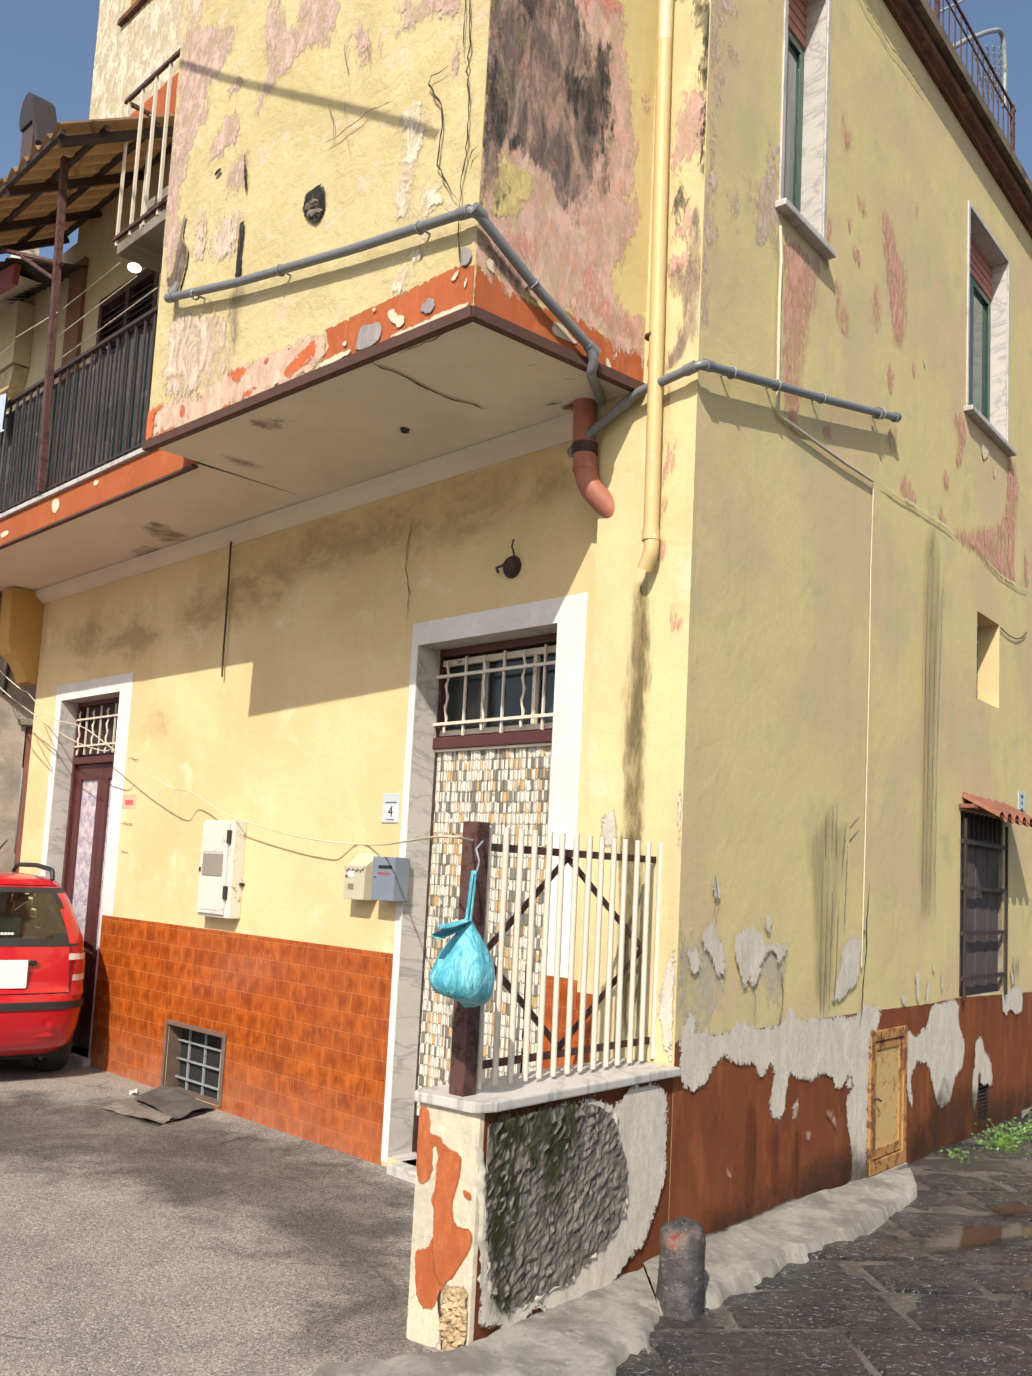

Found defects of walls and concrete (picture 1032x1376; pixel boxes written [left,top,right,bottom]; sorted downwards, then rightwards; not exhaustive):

crack [326,0,476,264]
peeling [395,182,443,221]
mould [480,0,614,224]
peeling [476,0,650,369]
peeling [667,0,866,424]
peeling [145,248,468,440]
crack [373,363,482,409]
water stain [619,585,648,1028]
flaking render [406,911,882,1352]
water stain [820,809,860,1011]
peeling [901,964,993,1110]
peeling [1002,969,1023,1015]